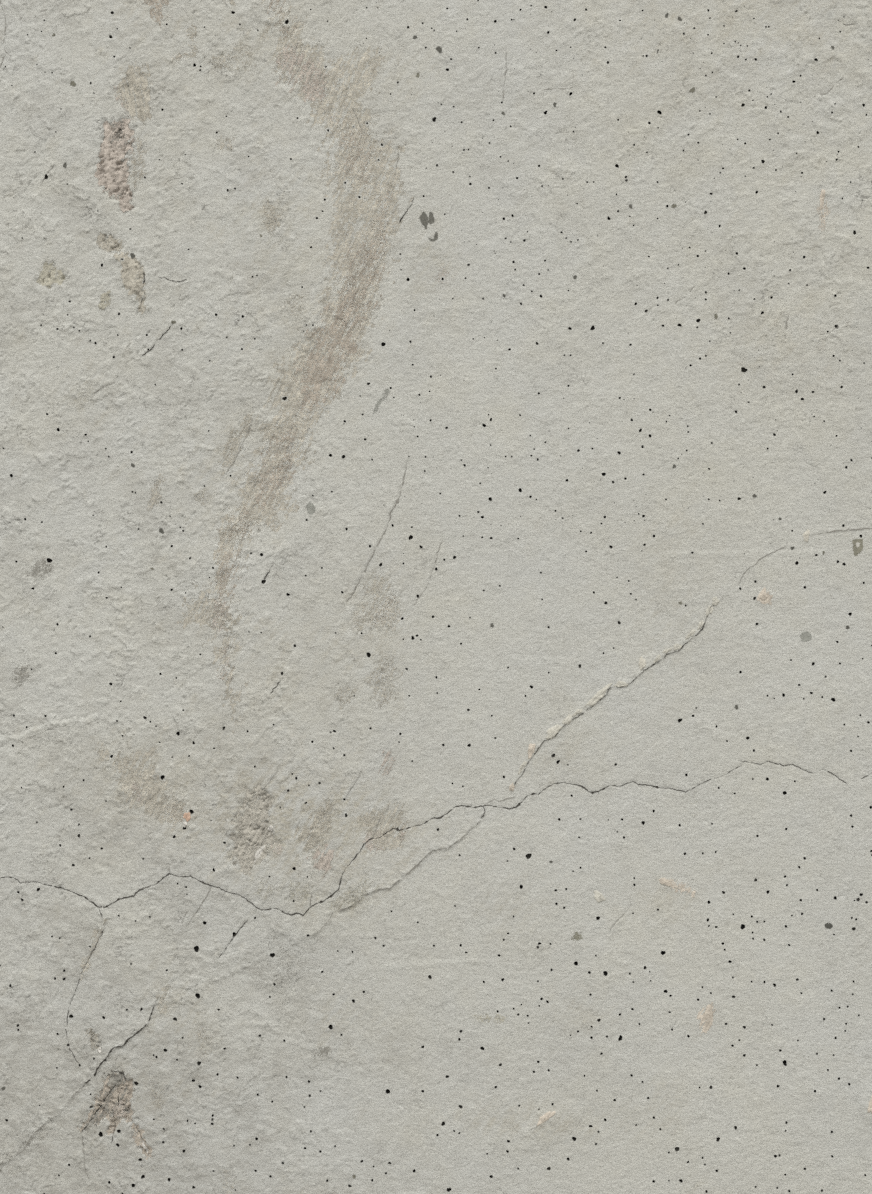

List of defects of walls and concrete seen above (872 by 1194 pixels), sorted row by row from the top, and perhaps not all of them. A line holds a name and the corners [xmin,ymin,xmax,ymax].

spalling [94,118,135,213]
crack [1,528,872,1097]